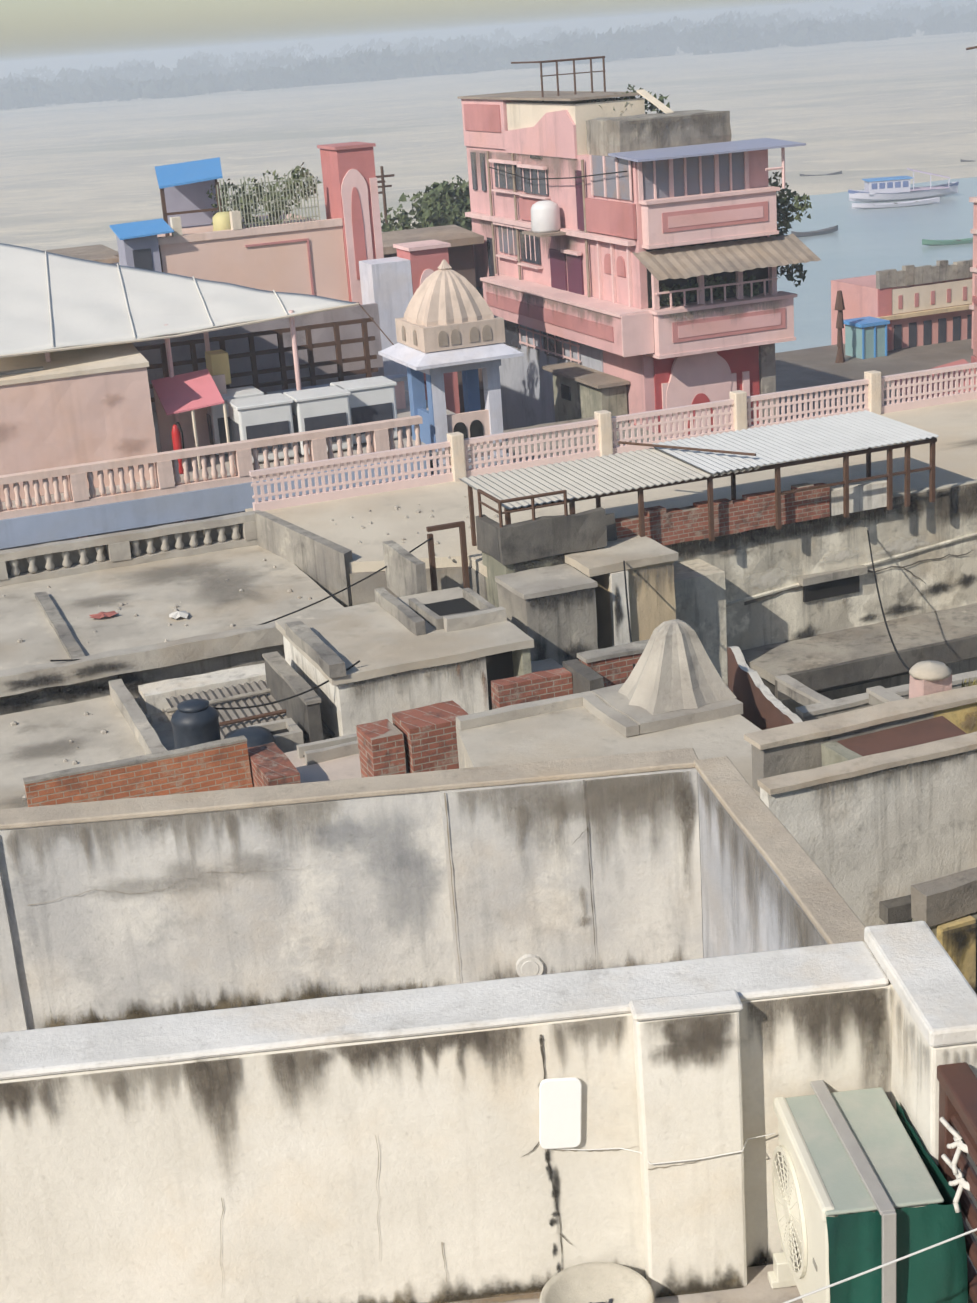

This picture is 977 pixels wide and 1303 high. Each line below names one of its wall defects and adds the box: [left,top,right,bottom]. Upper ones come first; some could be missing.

leakage [149,802,328,844]
leakage [44,984,436,1028]
leakage [270,1027,520,1102]
crack [538,1035,546,1079]
leakage [663,1013,731,1062]
leakage [748,988,926,1089]
leakage [0,1077,61,1114]
leakage [90,1058,240,1136]
leakage [545,1151,559,1226]
crack [522,1142,738,1270]
leakage [358,1291,414,1303]
leakage [431,1244,560,1303]